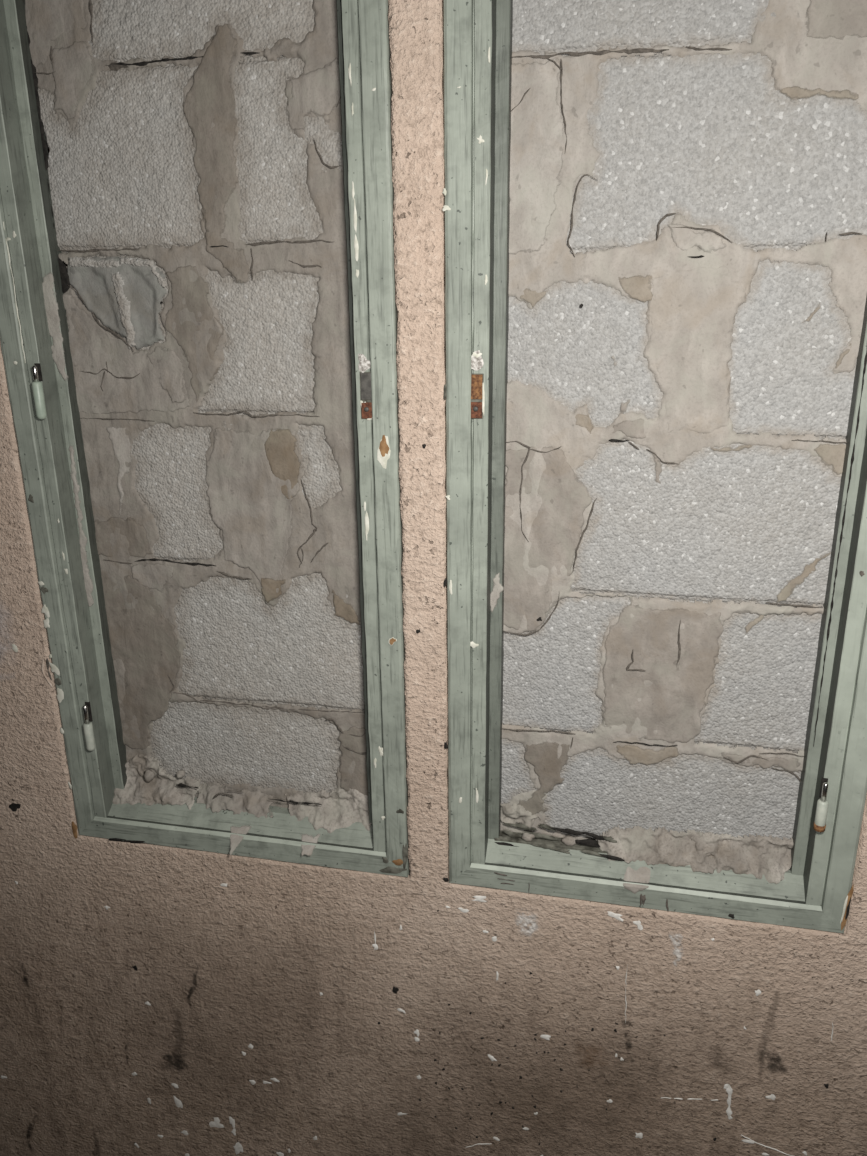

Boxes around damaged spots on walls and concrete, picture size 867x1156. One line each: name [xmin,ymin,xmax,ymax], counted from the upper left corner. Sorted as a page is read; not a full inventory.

peeling [3,222,26,365]
spalling [67,256,167,350]
peeling [358,354,371,373]
peeling [38,581,50,628]
peeling [41,654,64,703]
peeling [495,823,625,861]
damp [614,965,638,1061]
damp [724,1084,733,1118]